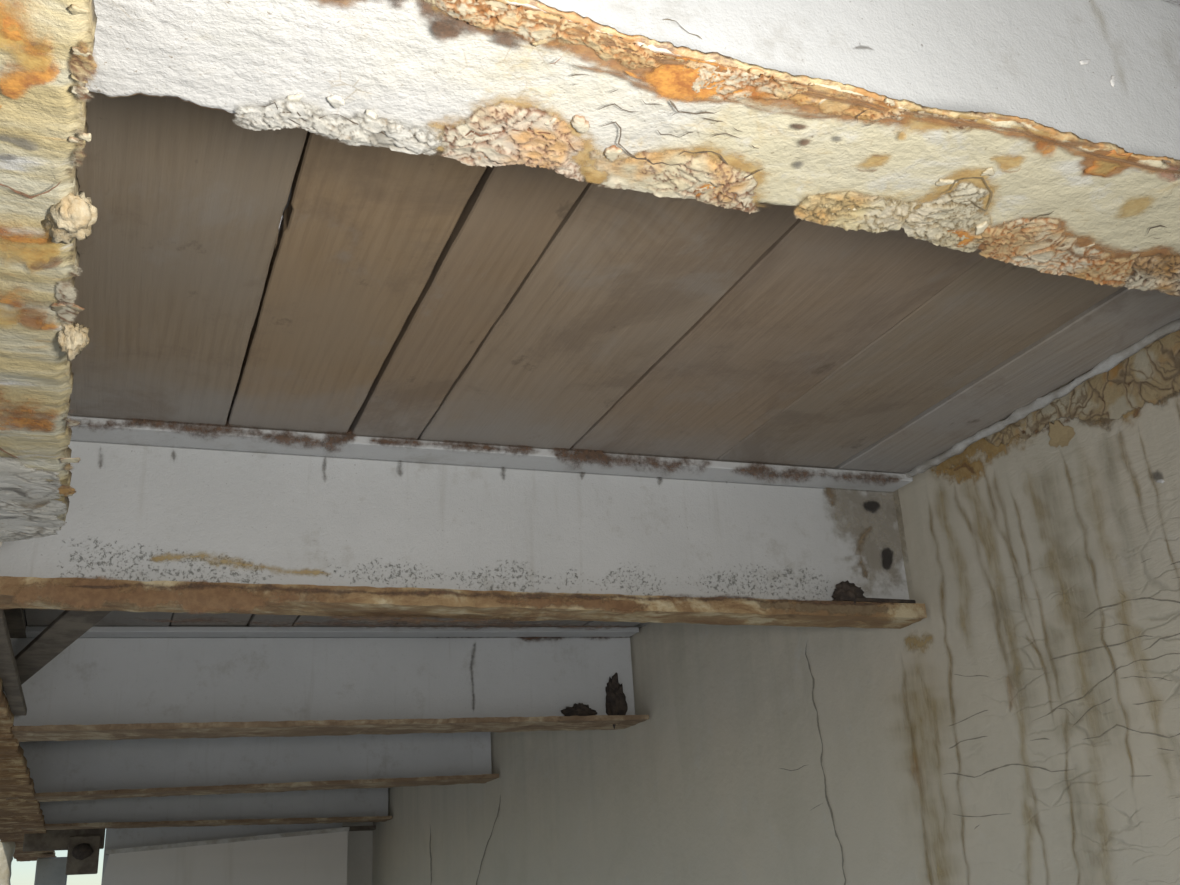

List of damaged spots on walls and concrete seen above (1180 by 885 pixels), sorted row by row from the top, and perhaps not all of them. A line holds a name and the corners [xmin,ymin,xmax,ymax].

corrosion [0,0,97,108]
corrosion [418,0,1180,173]
corrosion [68,118,91,167]
peeling [235,94,765,214]
peeling [794,167,995,253]
peeling [1161,160,1180,181]
corrosion [0,227,84,330]
peeling [0,448,67,547]
water stain [61,539,665,596]
water stain [677,565,832,599]
crack [780,645,846,885]
crack [476,804,500,885]